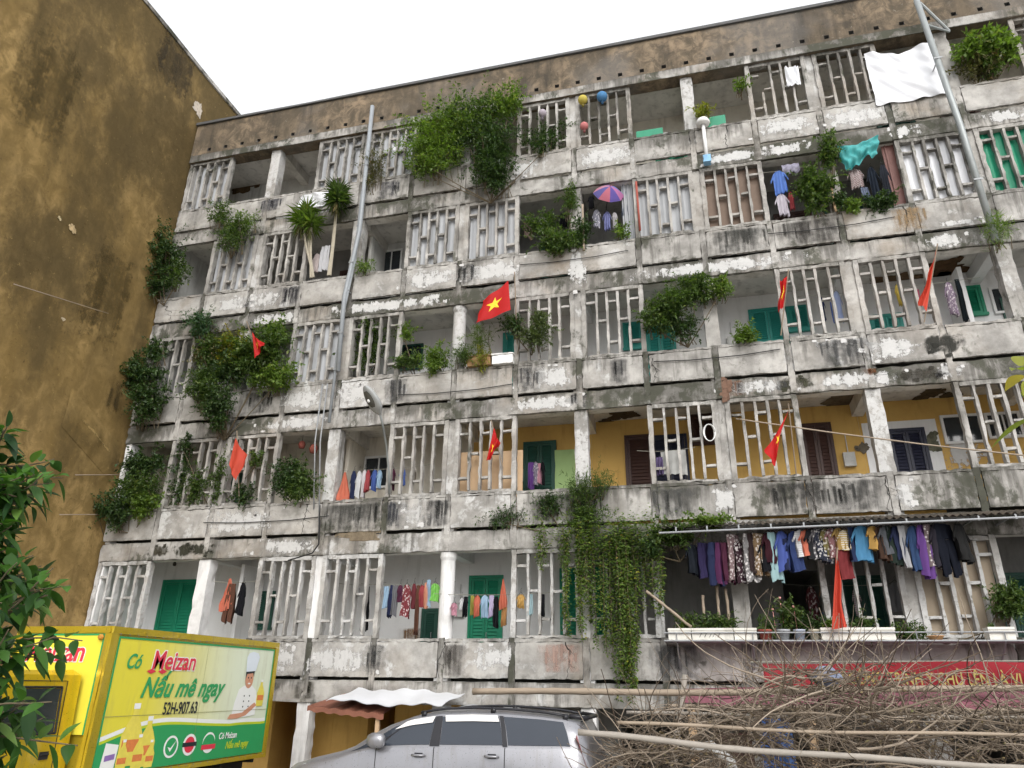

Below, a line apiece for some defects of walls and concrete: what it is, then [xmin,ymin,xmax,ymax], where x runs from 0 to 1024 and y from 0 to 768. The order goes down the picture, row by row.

peeling [332,256,526,316]
peeling [568,249,587,294]
spalling [869,216,985,284]
peeling [812,337,919,406]
mould [898,334,964,382]
spalling [912,363,965,400]
spalling [598,411,641,422]
damp [770,480,876,511]
mould [147,542,214,557]